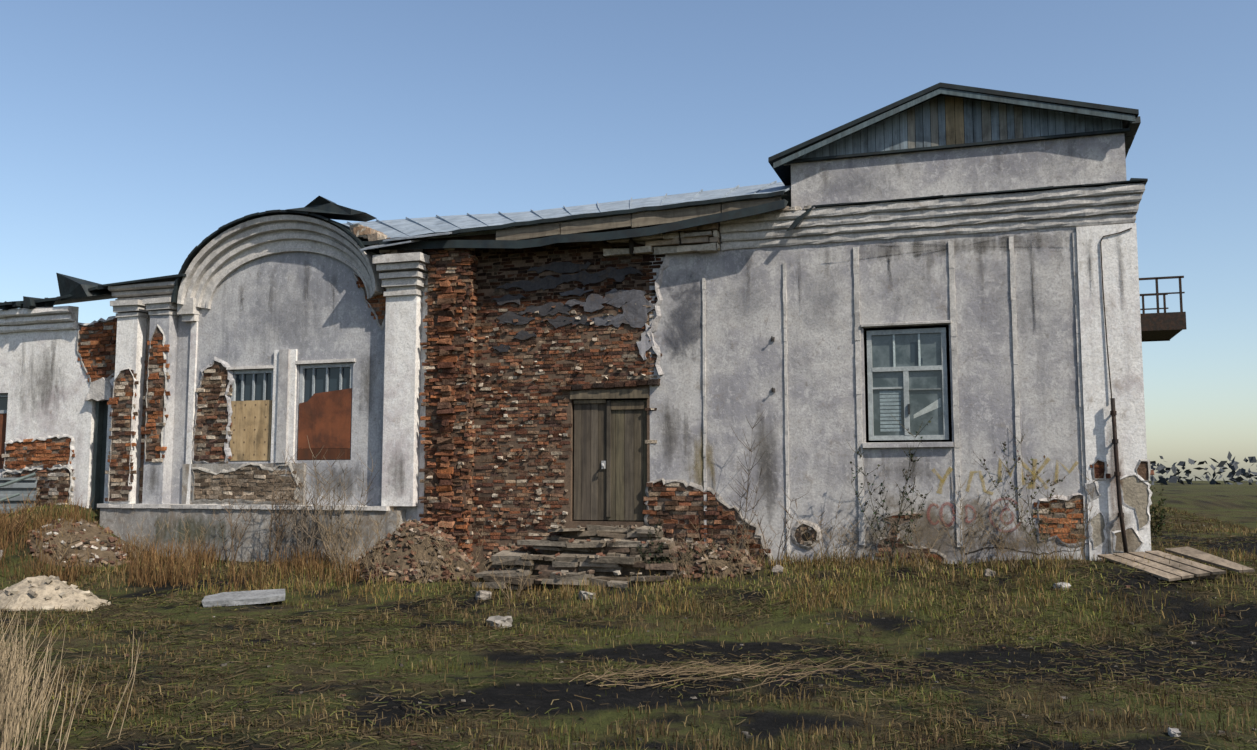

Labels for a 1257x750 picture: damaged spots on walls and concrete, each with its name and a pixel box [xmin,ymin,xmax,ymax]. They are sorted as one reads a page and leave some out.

flaking render [1,434,75,506]
flaking render [75,316,171,503]
flaking render [191,357,302,505]
rust [298,388,352,449]
flaking render [419,248,655,560]
peeling [1032,459,1154,553]